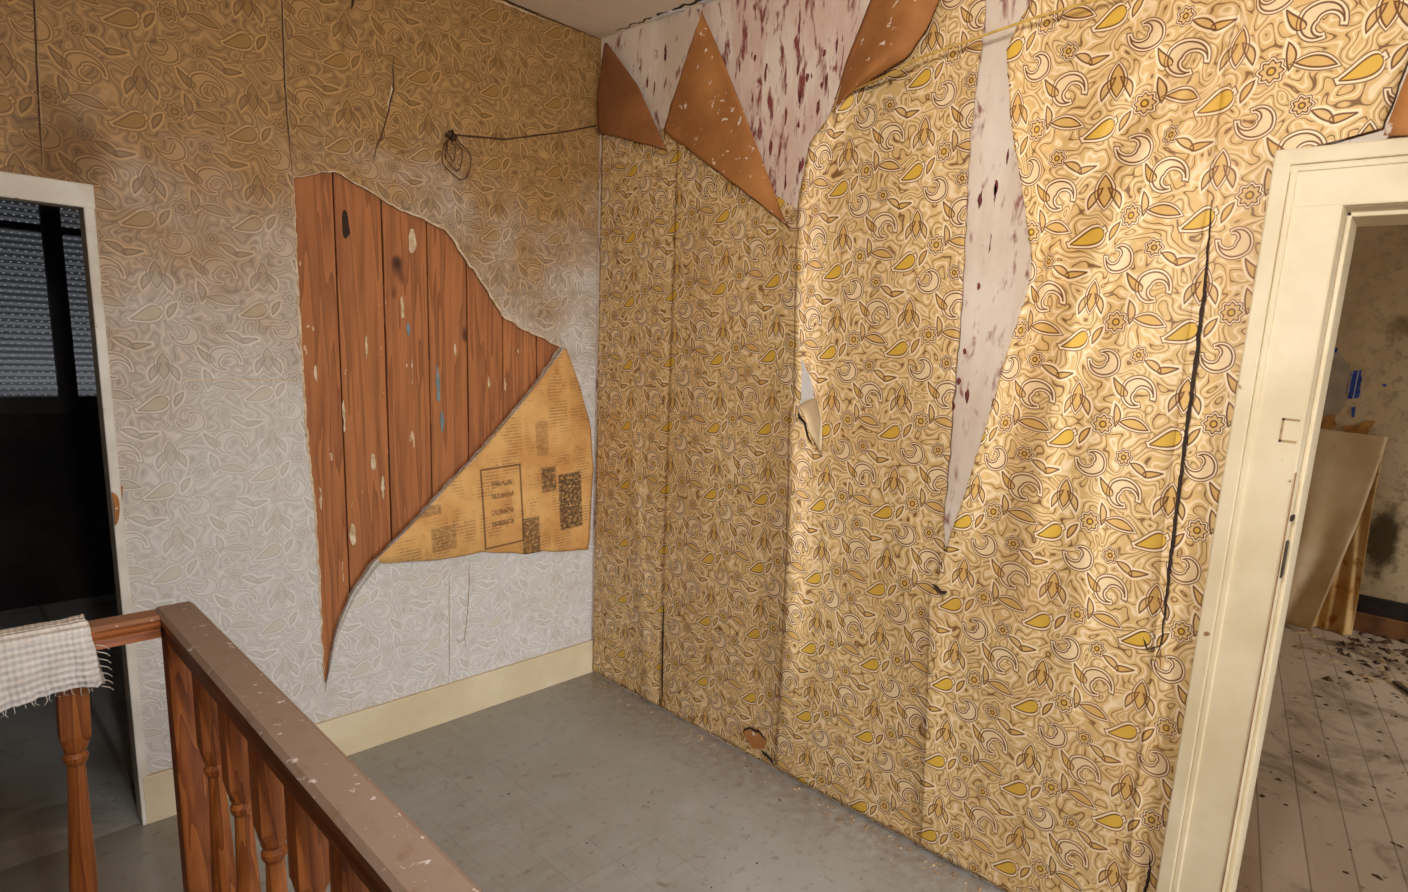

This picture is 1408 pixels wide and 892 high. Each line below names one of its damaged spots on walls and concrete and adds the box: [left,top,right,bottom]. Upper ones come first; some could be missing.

flaking render [597,0,939,228]
peeling [1383,73,1408,136]
peeling [409,229,417,253]
flaking render [943,0,1031,549]
peeling [436,366,444,432]
peeling [798,358,822,451]
peeling [371,453,385,498]
leakage [1365,513,1399,577]